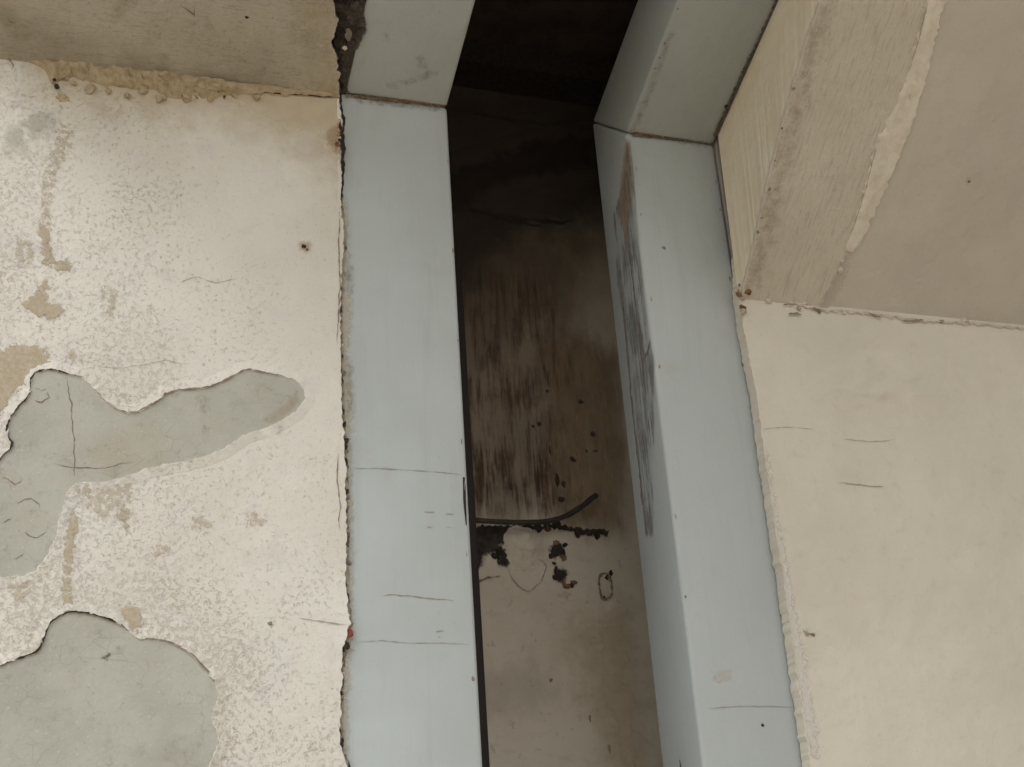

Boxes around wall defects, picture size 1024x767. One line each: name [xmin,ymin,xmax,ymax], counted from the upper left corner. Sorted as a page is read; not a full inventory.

spalling [331,0,367,95]
peeling [0,343,315,767]
crack [264,92,354,767]
spalling [463,477,609,589]